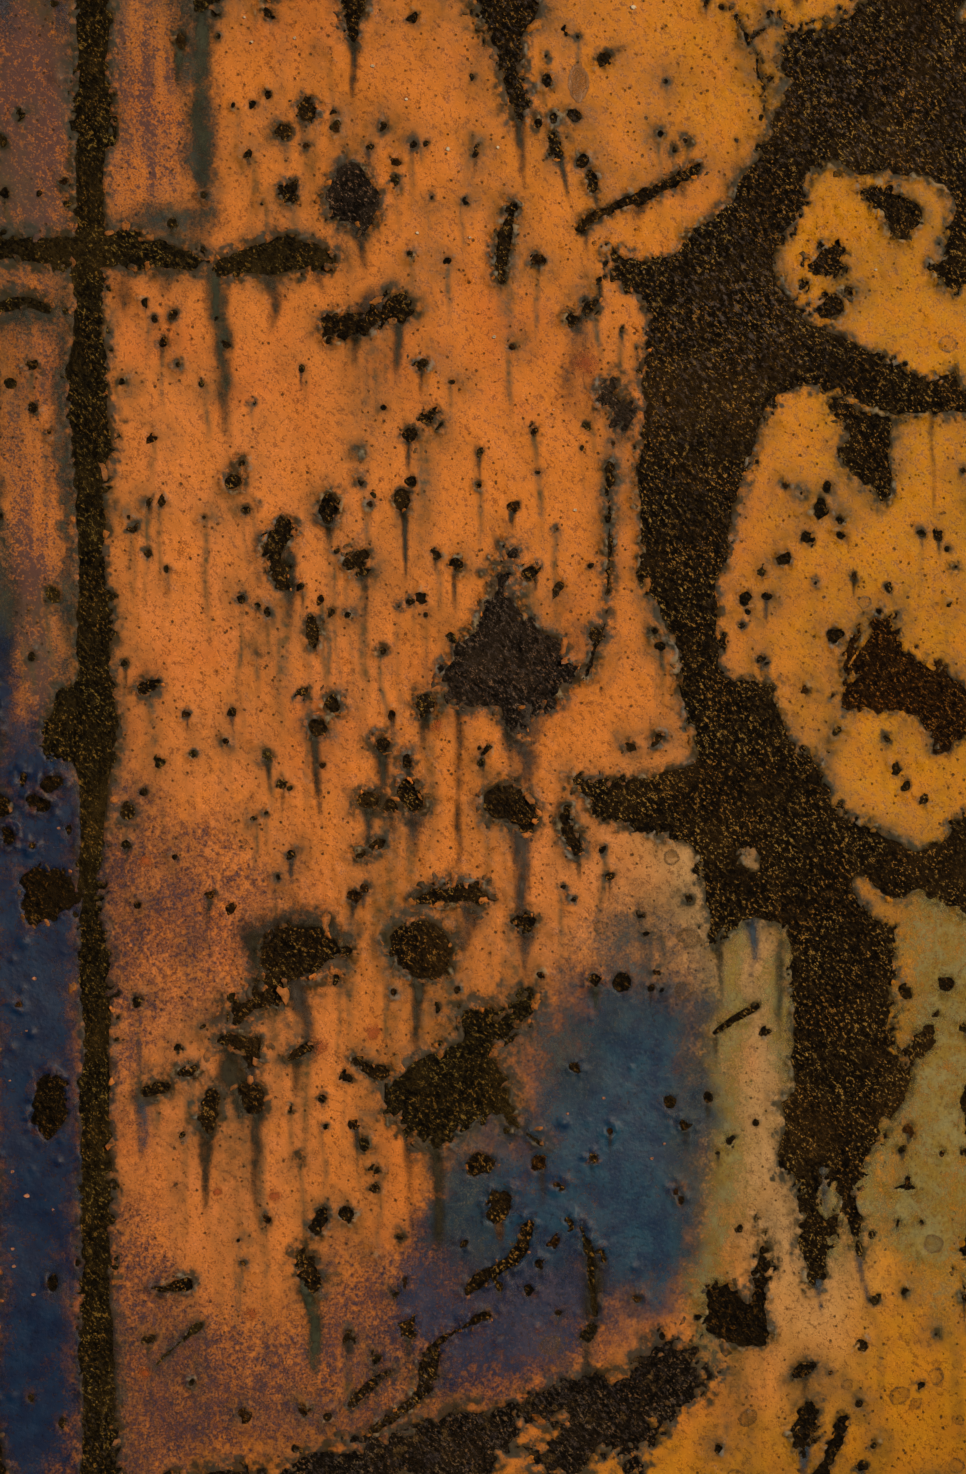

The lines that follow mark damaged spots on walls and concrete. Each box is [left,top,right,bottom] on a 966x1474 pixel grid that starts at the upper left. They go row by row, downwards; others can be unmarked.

rust [260,121,429,258]
rust [320,289,428,380]
rust [0,0,354,1474]
rust [312,493,375,593]
rust [339,0,966,1305]
rust [207,1213,783,1474]